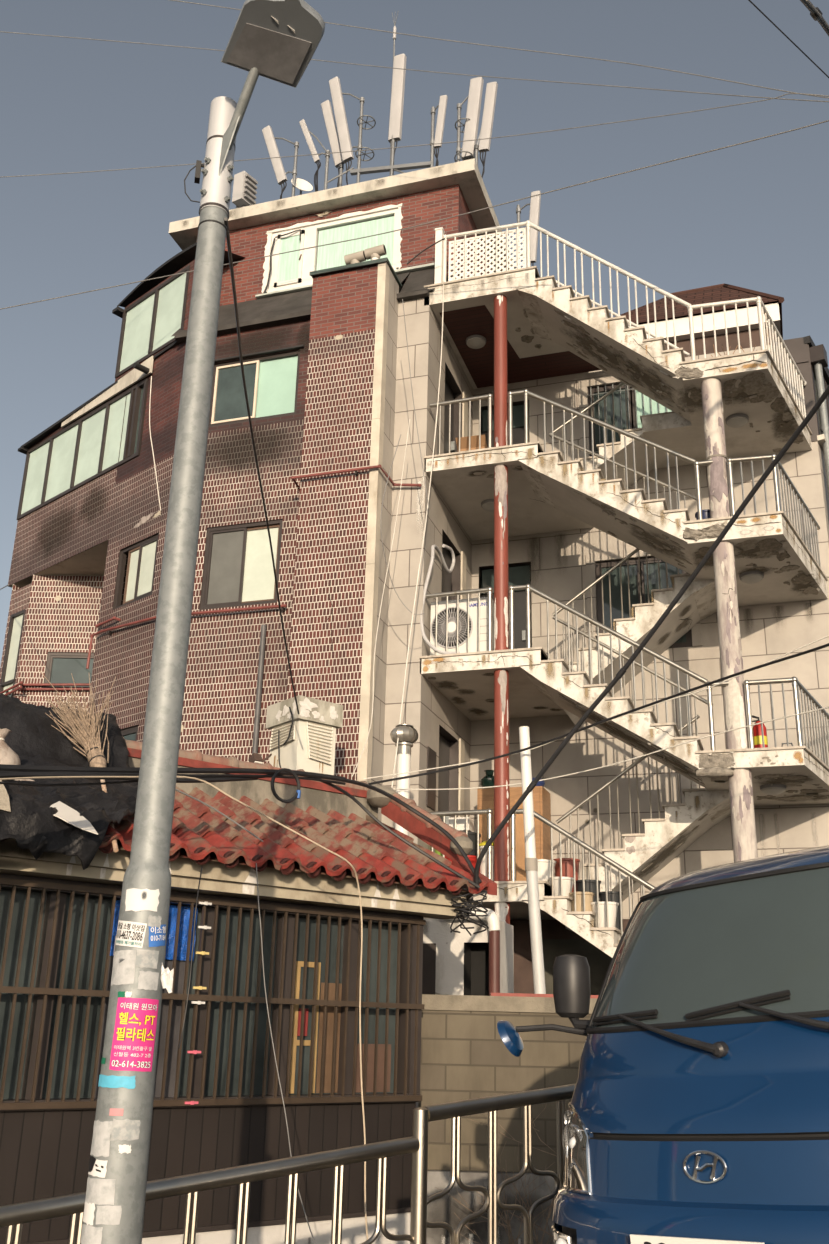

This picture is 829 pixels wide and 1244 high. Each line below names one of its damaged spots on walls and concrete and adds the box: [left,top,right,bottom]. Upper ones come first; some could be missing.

water stain [574,331,702,412]
water stain [773,407,805,441]
peeling [550,310,829,823]
peeling [494,597,508,650]
peeling [484,669,508,763]